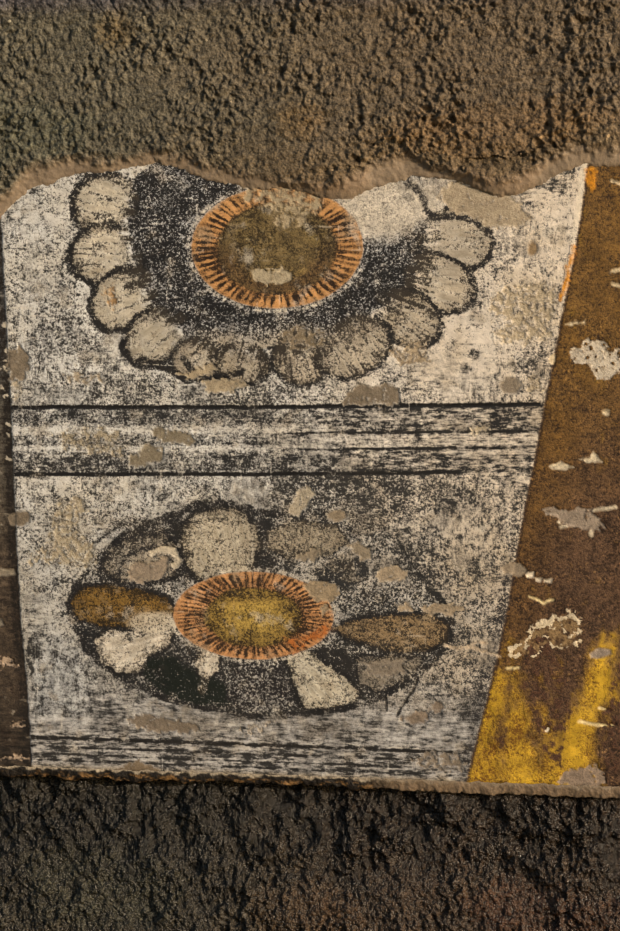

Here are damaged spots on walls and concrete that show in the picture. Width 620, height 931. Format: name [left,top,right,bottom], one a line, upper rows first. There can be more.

flaking render [609,266,620,289]
peeling [485,275,587,365]
flaking render [569,336,620,381]
peeling [498,373,547,396]
peeling [542,504,618,539]
peeling [505,595,584,671]
peeling [589,647,613,660]
flaking render [576,718,614,728]